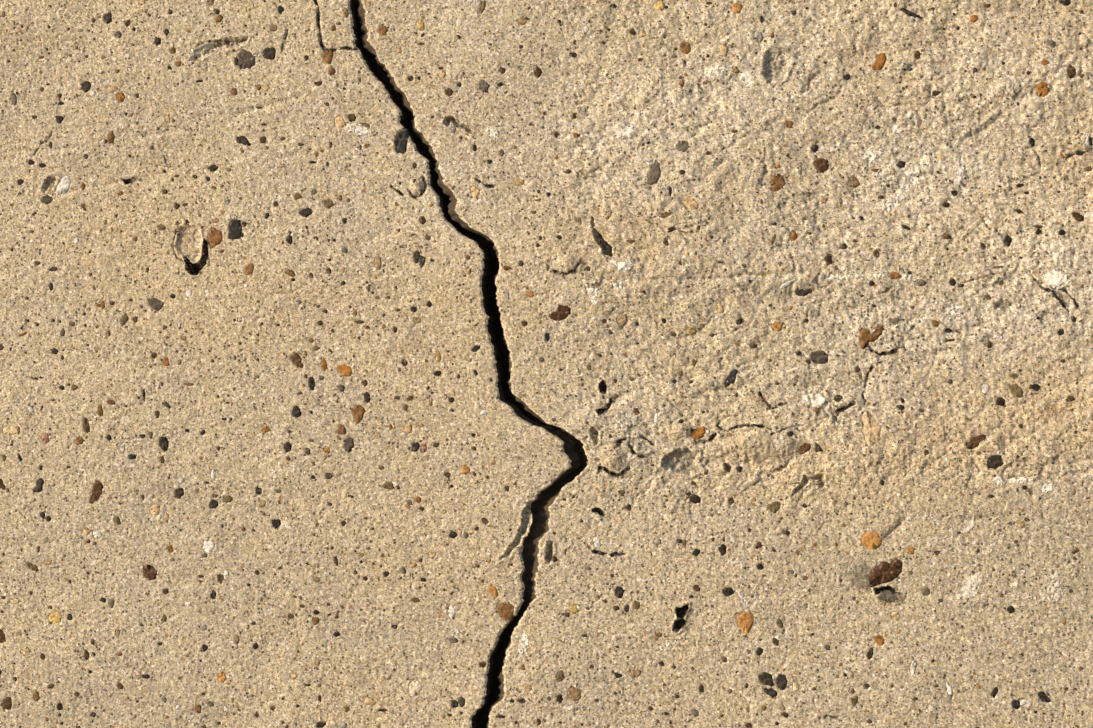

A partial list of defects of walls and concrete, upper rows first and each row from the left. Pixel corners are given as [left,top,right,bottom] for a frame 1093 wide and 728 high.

crack [314,0,655,728]